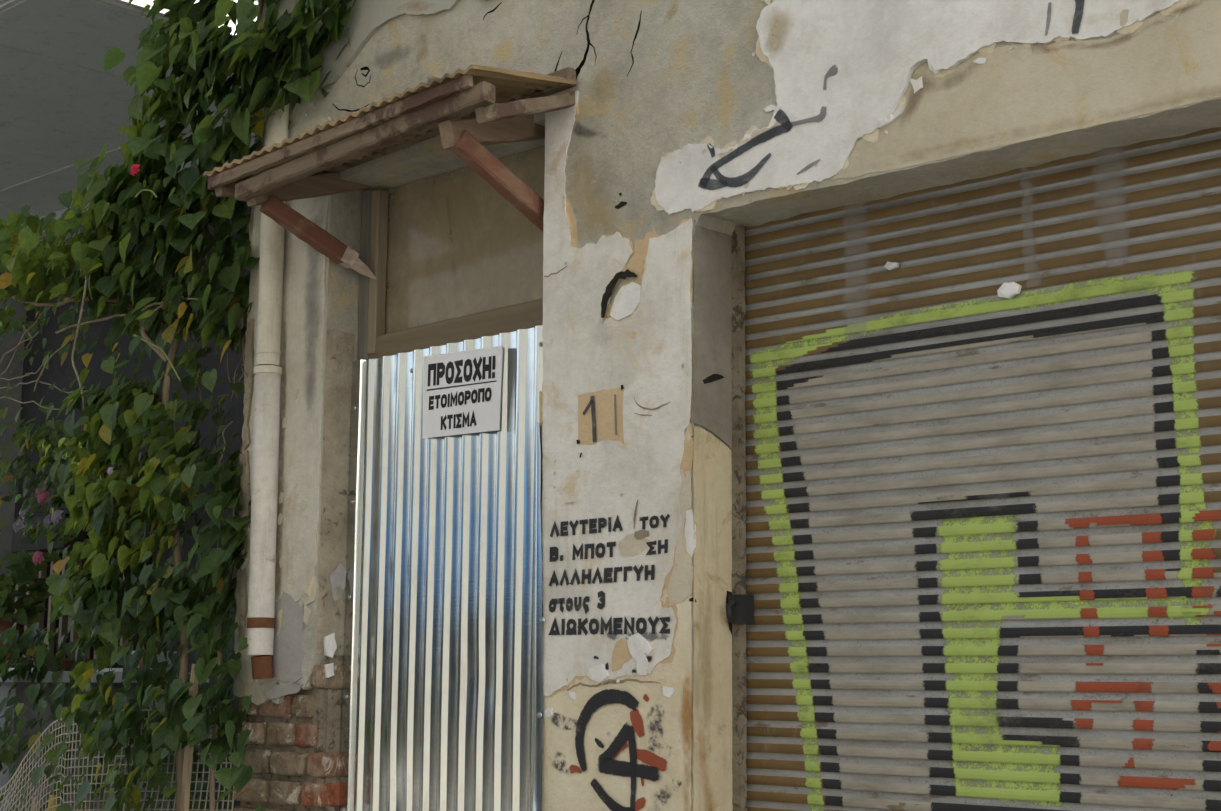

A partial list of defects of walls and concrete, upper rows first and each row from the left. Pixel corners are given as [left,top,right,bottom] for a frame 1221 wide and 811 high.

flaking render [265,0,308,20]
flaking render [285,0,460,94]
crack [554,0,597,80]
peeling [288,113,331,139]
peeling [286,195,330,231]
peeling [539,0,1221,811]
peeling [233,205,355,811]